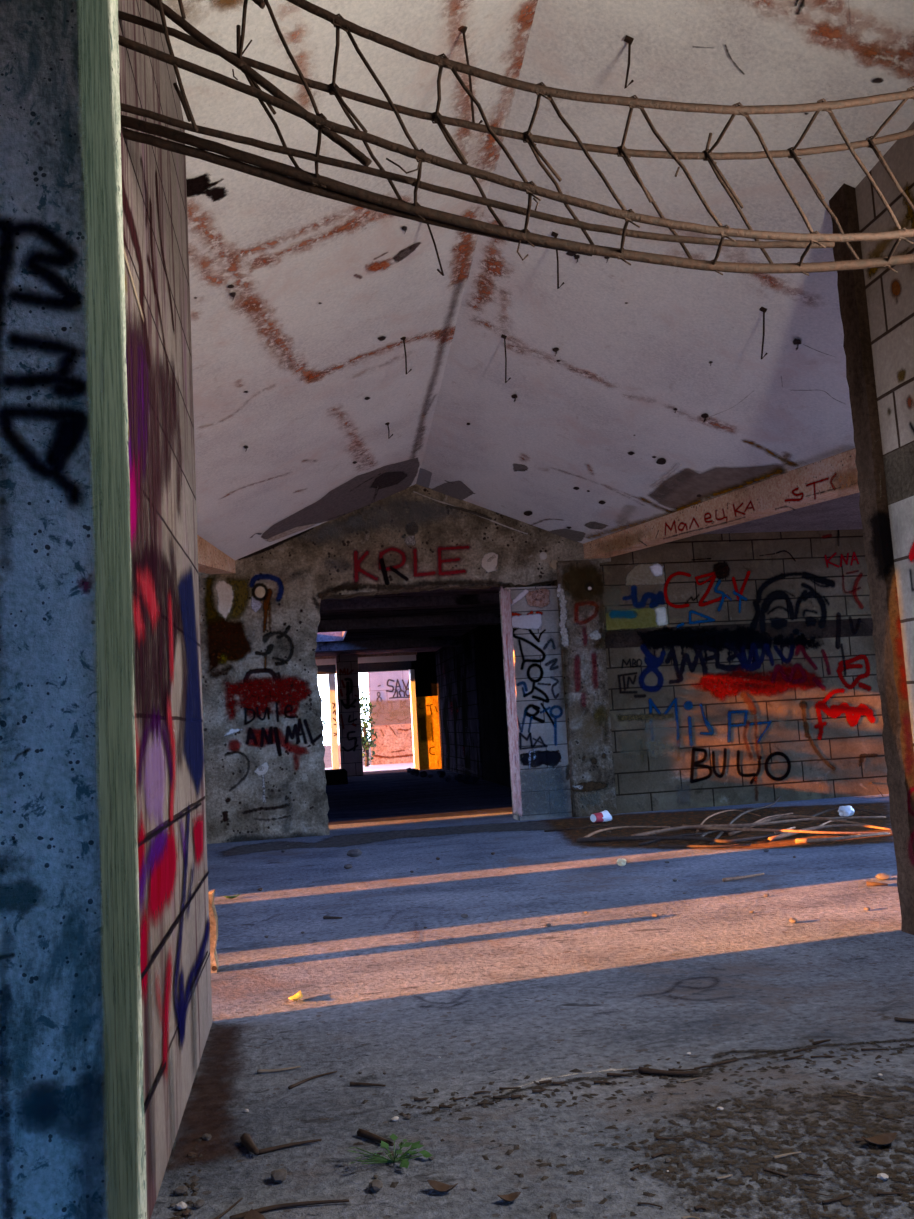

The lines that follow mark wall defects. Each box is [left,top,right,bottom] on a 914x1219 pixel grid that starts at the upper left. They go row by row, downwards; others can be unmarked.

rust [517,5,535,38]
rust [813,25,914,77]
rust [187,205,455,382]
rust [452,209,504,327]
spalling [250,458,475,542]